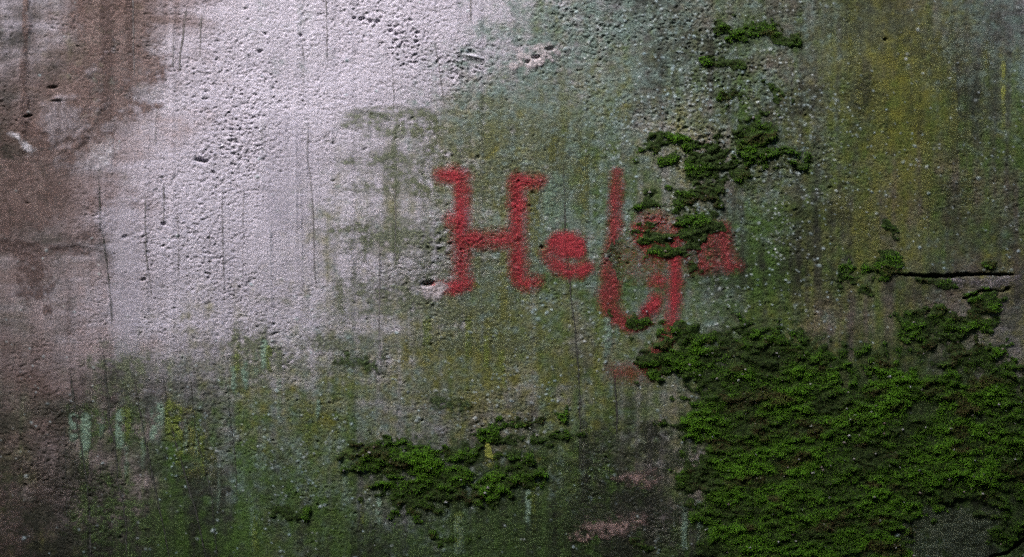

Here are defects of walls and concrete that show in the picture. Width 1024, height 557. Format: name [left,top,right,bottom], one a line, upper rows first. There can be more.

crack [891,273,1014,299]
leakage [69,413,90,450]
leakage [115,409,125,445]
leakage [575,419,701,557]